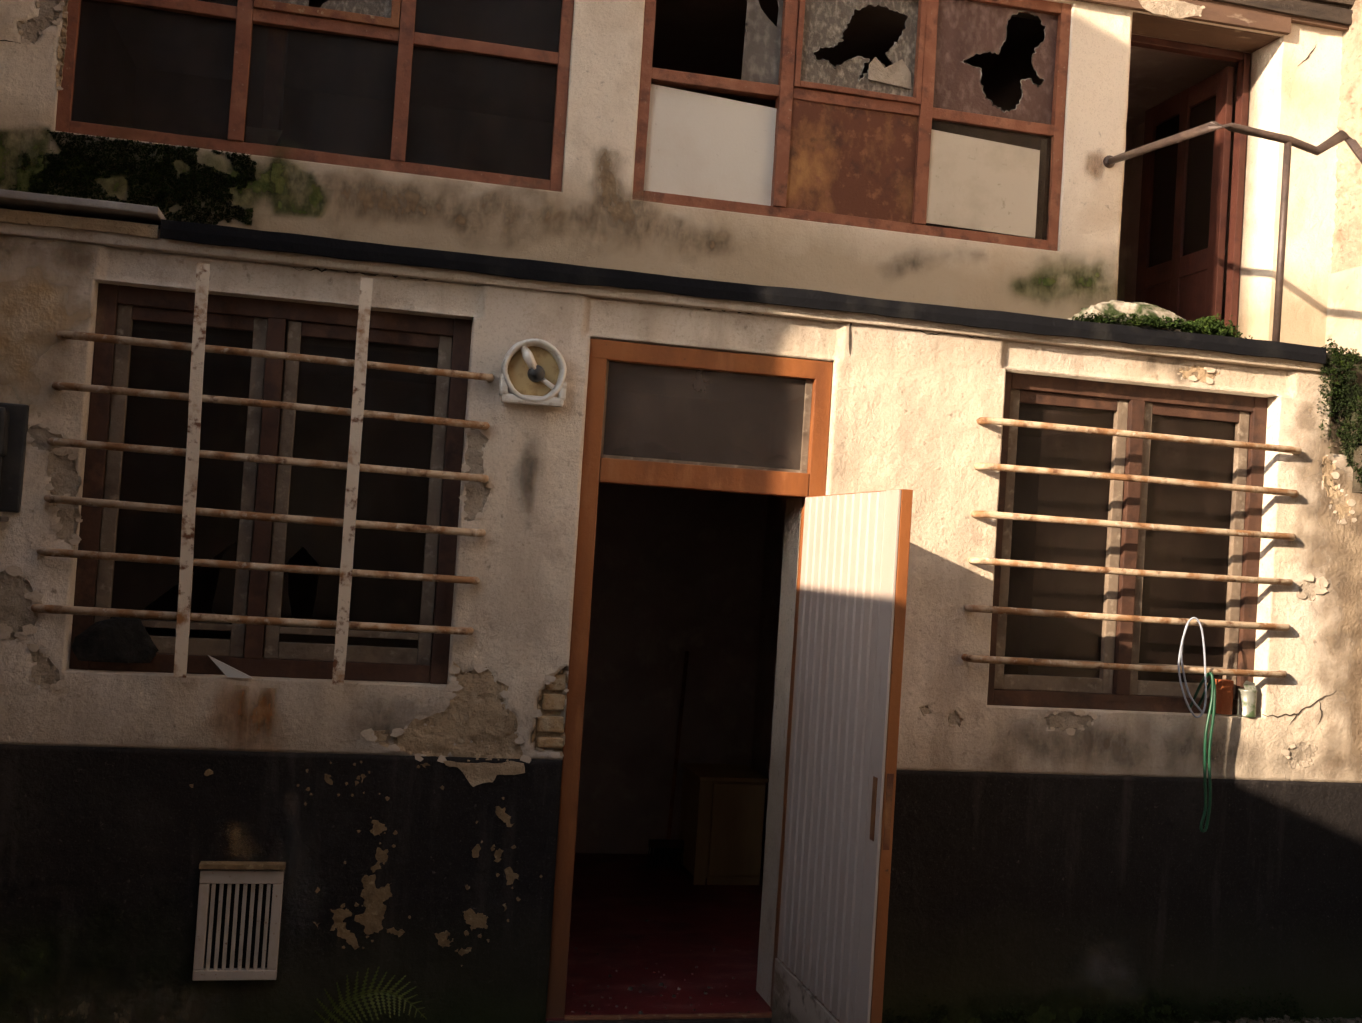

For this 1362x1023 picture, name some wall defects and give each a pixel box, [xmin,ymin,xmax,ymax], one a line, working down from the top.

flaking render [17,0,69,91]
peeling [1139,0,1205,19]
damp [0,129,49,194]
damp [270,159,520,230]
damp [596,150,652,236]
rust [785,99,918,223]
flaking render [26,423,83,546]
flaking render [1322,456,1357,524]
flaking render [360,662,569,787]
flaking render [1281,742,1317,769]
crack [1262,690,1337,724]
peeling [313,817,411,950]